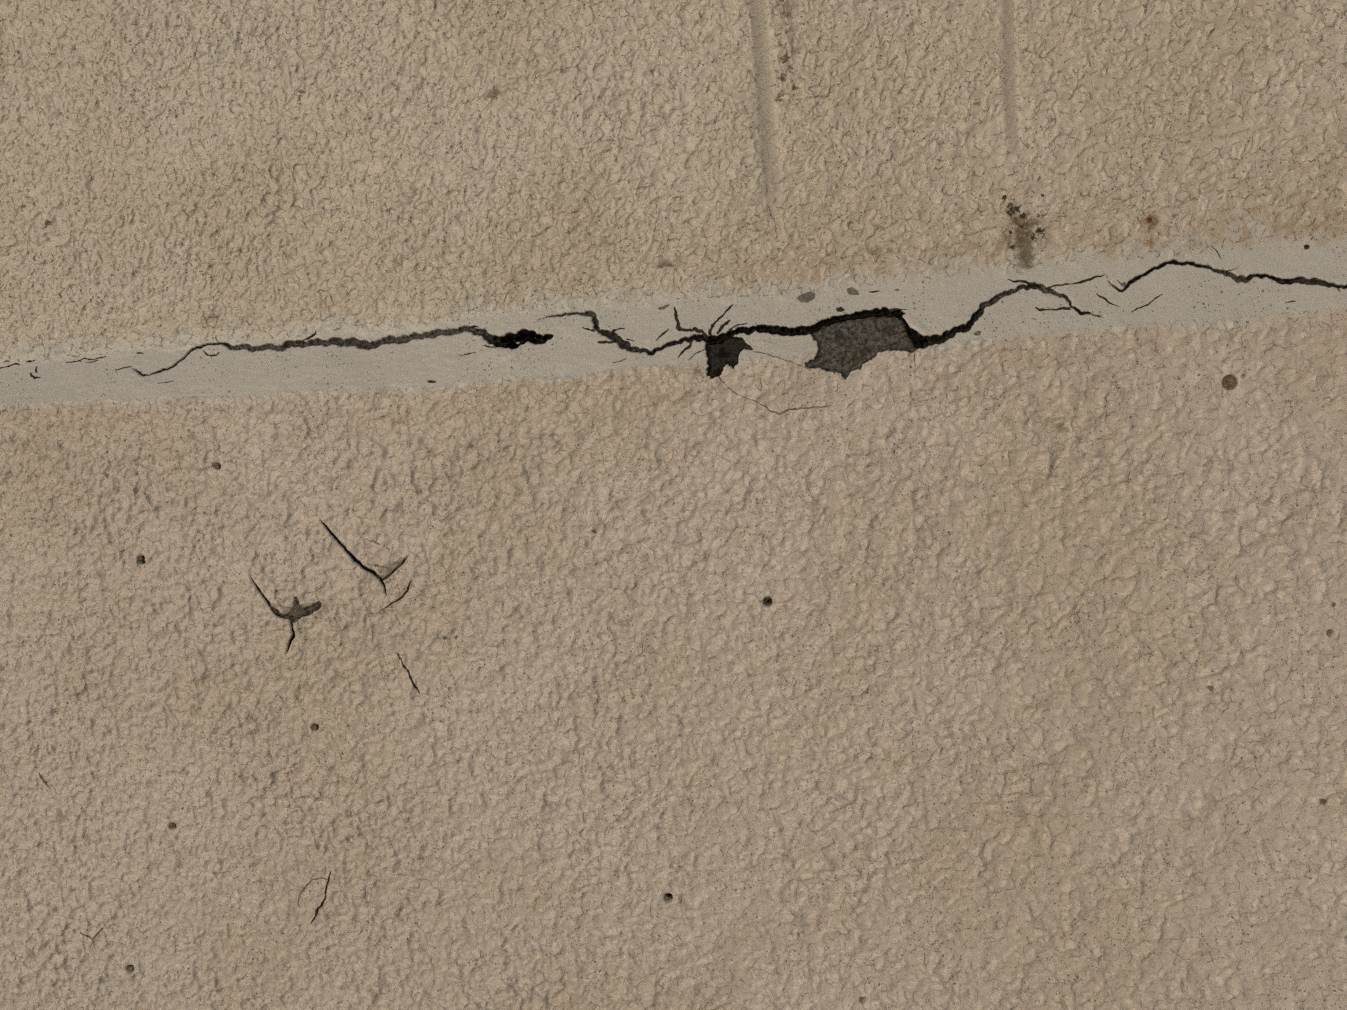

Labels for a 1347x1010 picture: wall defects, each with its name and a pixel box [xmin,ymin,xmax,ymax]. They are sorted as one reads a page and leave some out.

crack [115,245,1347,415]
spalling [705,287,932,380]
crack [250,577,322,653]
crack [321,521,420,694]